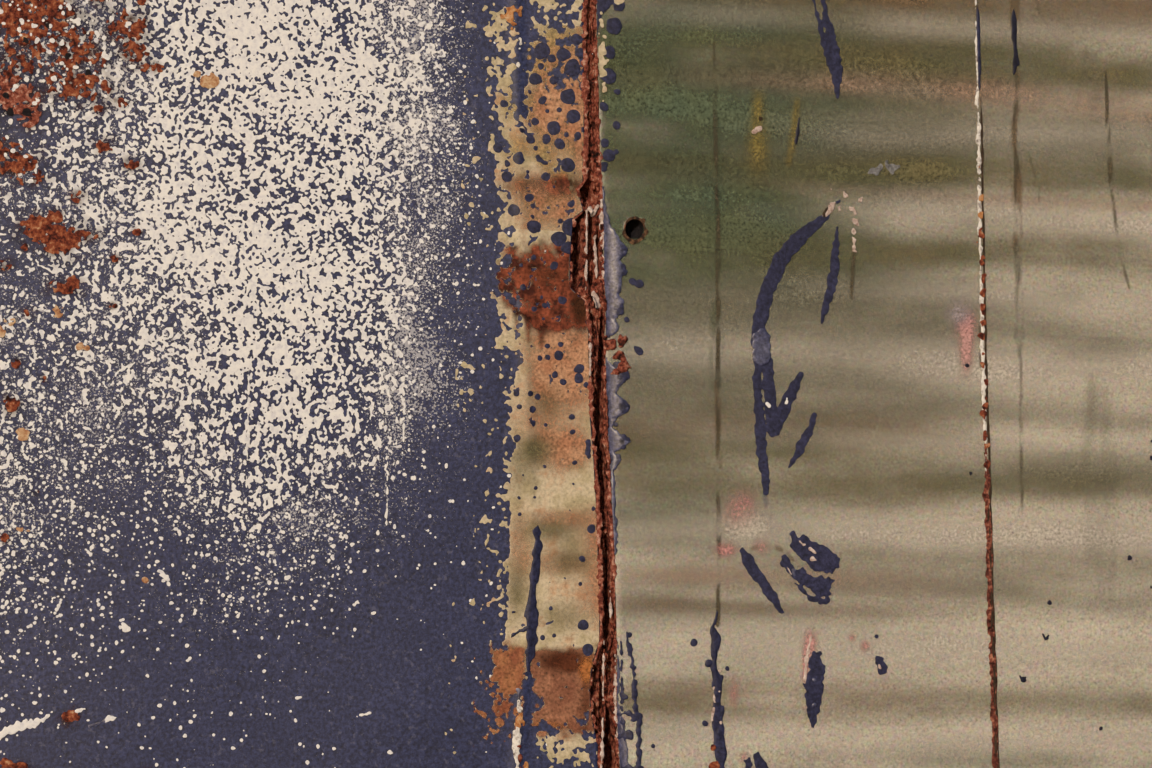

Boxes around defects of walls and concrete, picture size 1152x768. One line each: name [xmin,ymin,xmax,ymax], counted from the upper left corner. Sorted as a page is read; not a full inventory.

rust [0,0,164,128]
rust [0,137,44,185]
rust [96,140,113,153]
rust [19,210,99,255]
peeling [0,0,631,768]
rust [473,0,620,768]